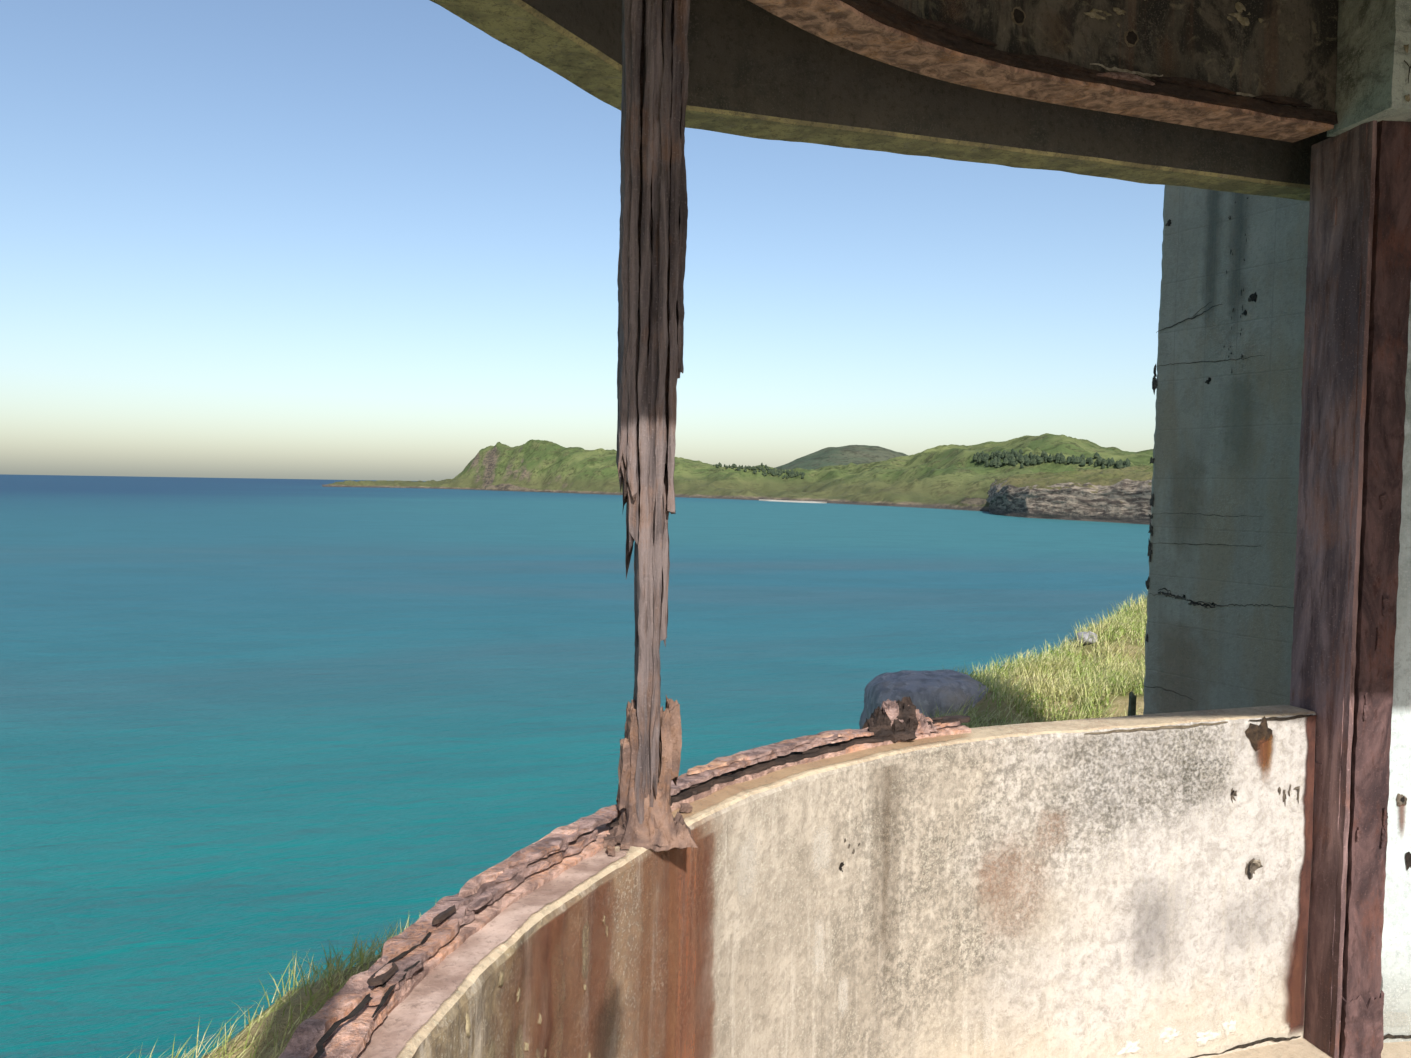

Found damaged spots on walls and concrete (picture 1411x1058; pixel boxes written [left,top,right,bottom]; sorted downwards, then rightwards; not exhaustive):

crack [1156,302,1264,367]
rust [279,0,971,1058]
crack [1149,588,1294,609]
rust [1245,716,1273,771]
crack [1190,1035,1301,1058]